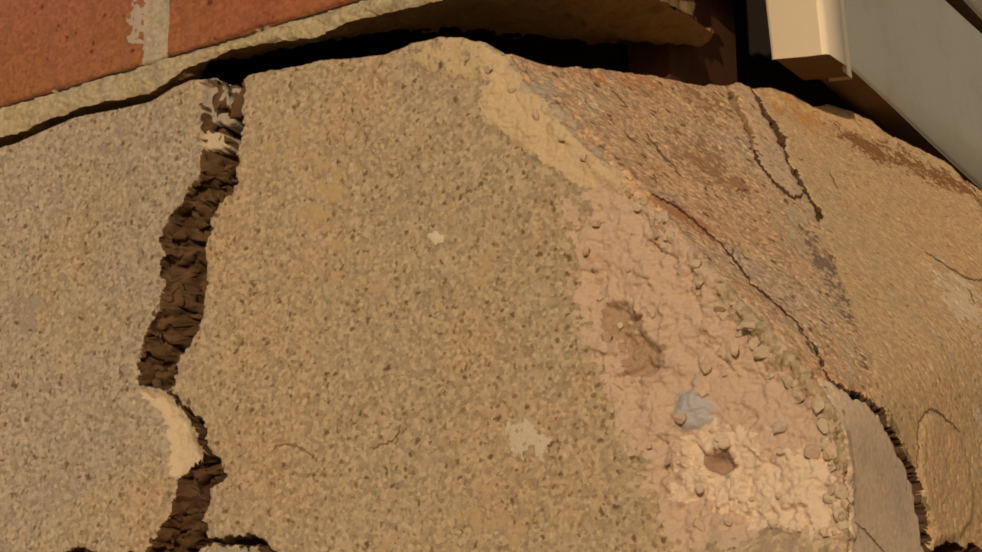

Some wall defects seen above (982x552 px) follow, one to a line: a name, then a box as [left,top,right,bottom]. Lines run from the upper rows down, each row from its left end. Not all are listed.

crack [646,133,681,176]
crack [727,88,824,223]
crack [128,80,277,552]
spalling [477,46,856,552]
crack [651,193,982,552]
crack [273,443,314,456]
crack [66,544,97,552]